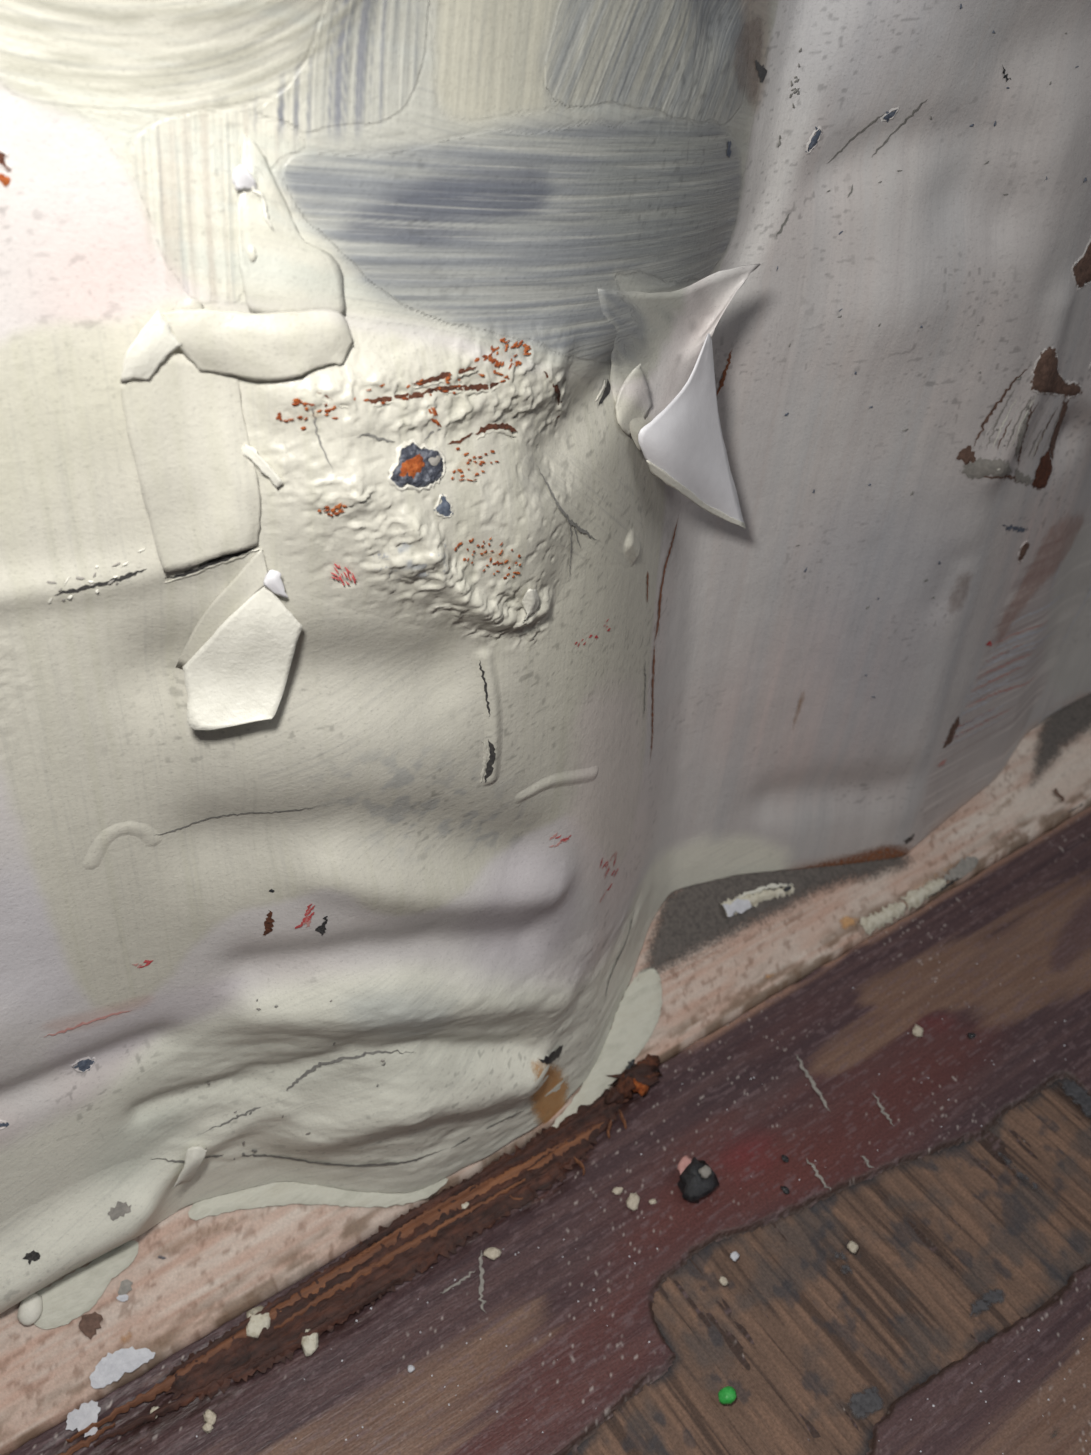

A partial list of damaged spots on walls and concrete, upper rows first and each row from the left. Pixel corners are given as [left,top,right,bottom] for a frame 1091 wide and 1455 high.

peeling [1071,236,1091,292]
peeling [242,443,283,490]
peeling [956,346,1091,490]
crack [479,661,496,783]